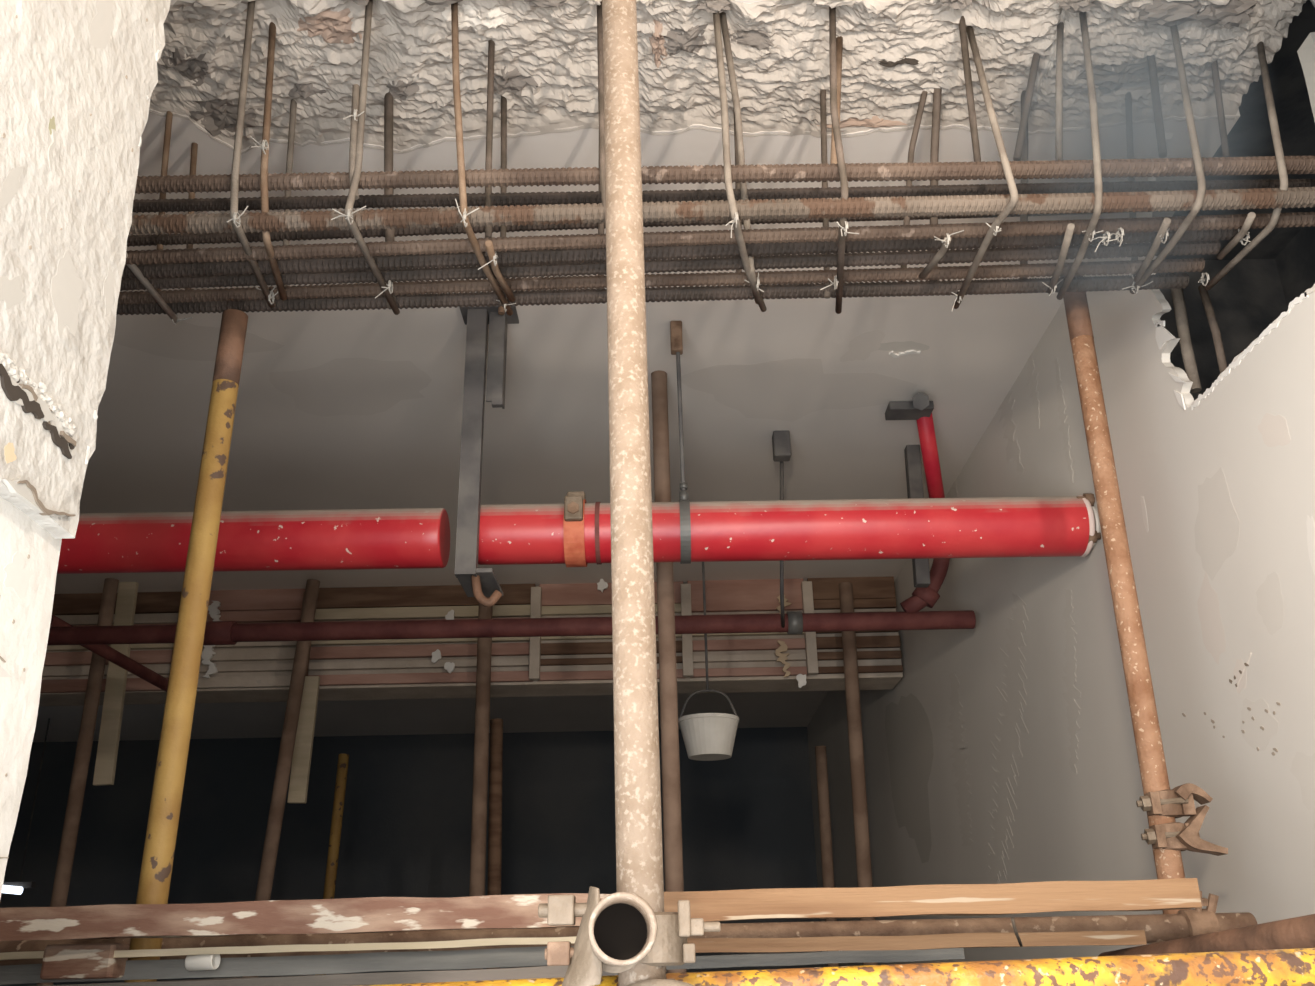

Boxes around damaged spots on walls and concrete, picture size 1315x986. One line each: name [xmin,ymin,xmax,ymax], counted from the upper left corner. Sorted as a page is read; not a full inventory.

spalling [297,8,362,44]
spalling [442,4,509,31]
spalling [649,20,708,68]
spalling [729,30,775,51]
spalling [161,48,263,137]
spalling [385,80,420,100]
spalling [494,66,542,96]
spalling [116,167,607,315]
spalling [641,156,1315,302]
peeling [1155,321,1176,349]
peeling [1173,284,1315,410]
spalling [0,349,77,450]